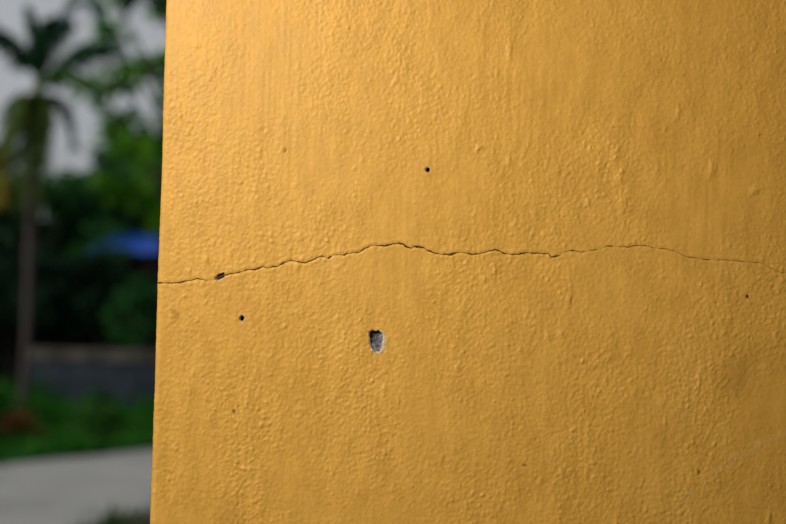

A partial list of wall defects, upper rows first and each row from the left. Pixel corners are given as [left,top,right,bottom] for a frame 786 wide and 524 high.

crack [157,242,786,284]
spalling [369,329,387,354]